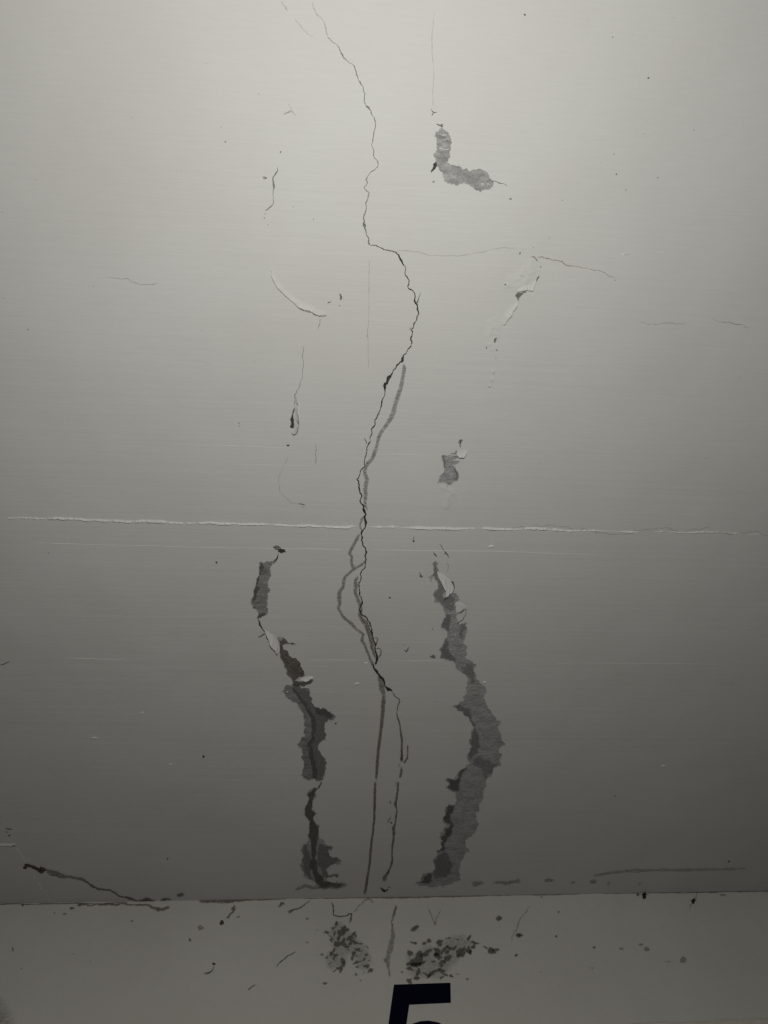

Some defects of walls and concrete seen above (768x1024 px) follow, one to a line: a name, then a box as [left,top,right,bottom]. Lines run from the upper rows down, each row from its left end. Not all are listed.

spalling [431,110,507,192]
crack [329,38,421,711]
spalling [436,439,469,512]
spalling [251,546,347,891]
spalling [415,546,506,889]
crack [0,863,168,911]
crack [201,897,278,905]
crack [304,894,570,935]
crack [661,888,767,896]